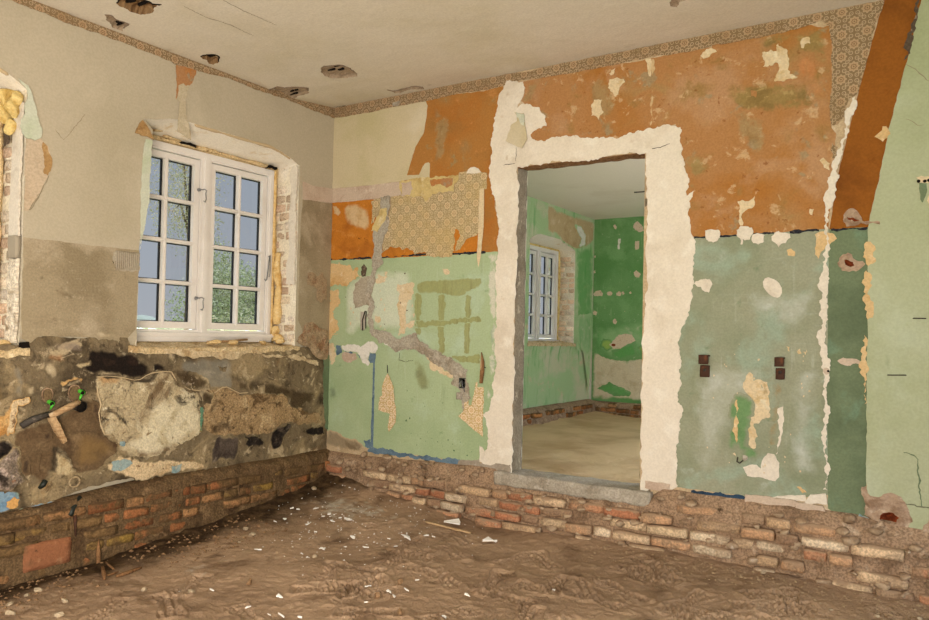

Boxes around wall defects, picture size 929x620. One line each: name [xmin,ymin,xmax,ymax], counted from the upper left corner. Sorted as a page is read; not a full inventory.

peeling [521,81,542,103]
peeling [586,73,617,136]
peeling [714,26,832,115]
peeling [684,152,712,191]
peeling [547,205,595,250]
spalling [843,208,880,227]
peeling [837,242,876,319]
peeling [485,252,498,404]
peeling [859,335,869,404]
peeling [0,370,322,494]
spalling [861,486,913,528]
crack [904,452,929,508]